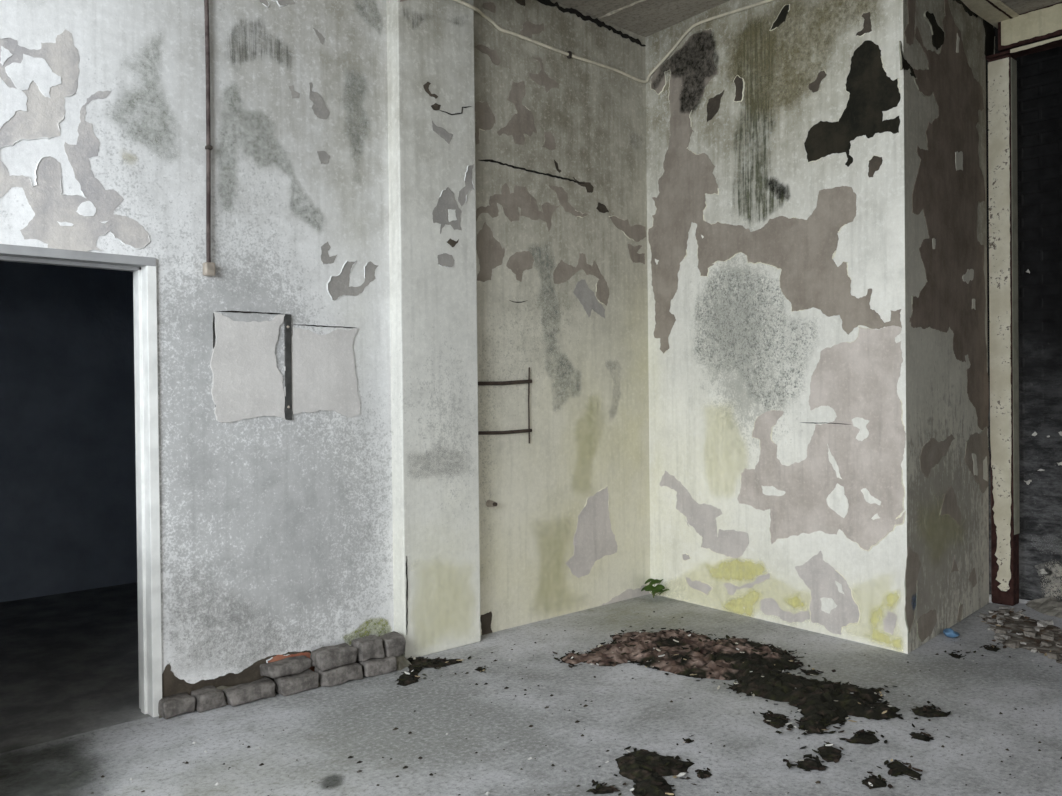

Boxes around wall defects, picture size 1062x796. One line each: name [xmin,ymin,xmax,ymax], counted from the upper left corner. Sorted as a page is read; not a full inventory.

peeling [0,29,150,252]
leakage [654,32,718,112]
leakage [730,0,874,220]
peeling [432,164,475,268]
peeling [321,242,378,301]
leakage [696,275,811,407]
peeling [474,0,1062,591]
spalling [480,612,493,635]
peeling [686,573,771,595]
peeling [760,551,861,635]
peeling [883,546,937,642]